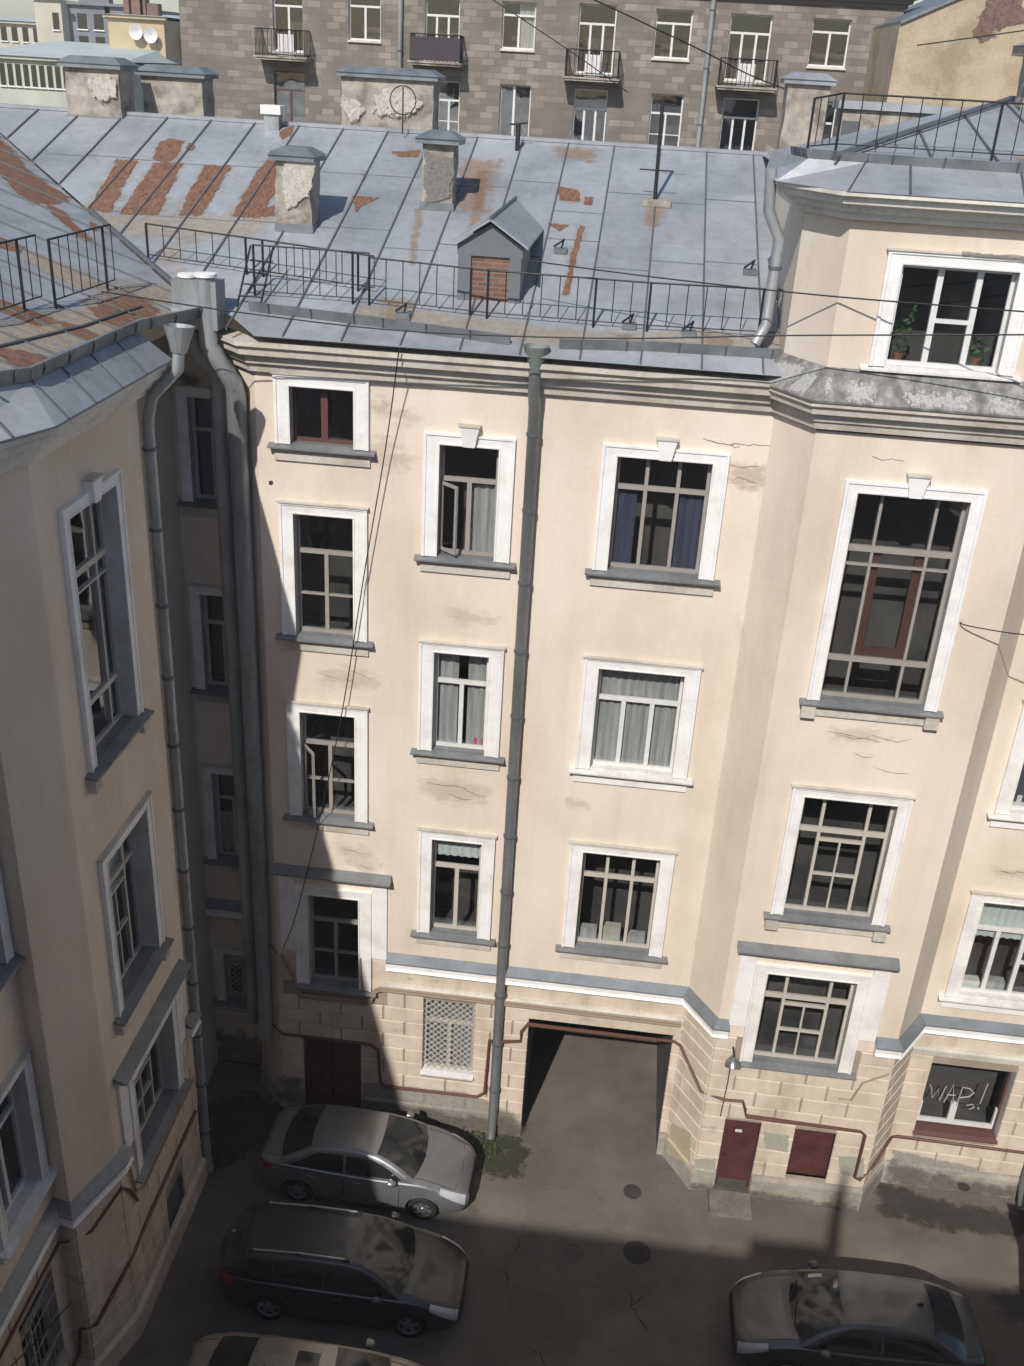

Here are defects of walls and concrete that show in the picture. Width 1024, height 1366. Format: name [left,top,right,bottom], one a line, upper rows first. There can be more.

spalling [972,0,1024,43]
corrosion [0,138,231,240]
corrosion [233,126,294,218]
spalling [281,161,316,209]
corrosion [558,187,593,205]
corrosion [548,223,585,295]